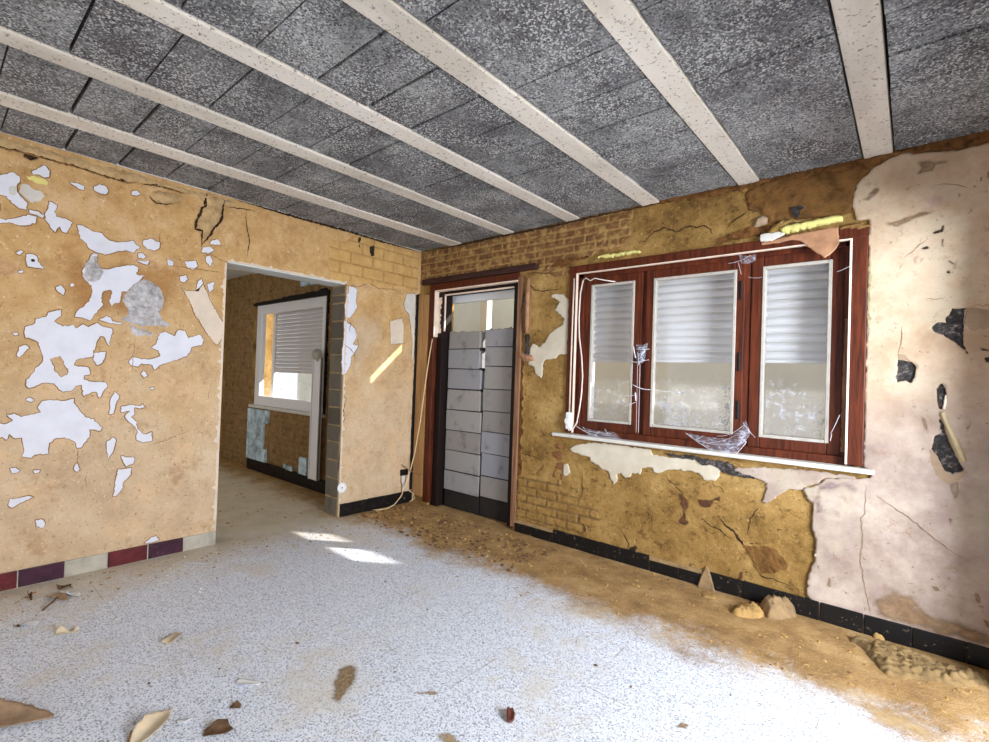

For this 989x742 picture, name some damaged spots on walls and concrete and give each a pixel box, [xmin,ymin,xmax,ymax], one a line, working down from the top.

flaking render [0,130,989,531]
crack [667,478,759,545]
flaking render [743,542,790,576]
crack [860,489,969,611]